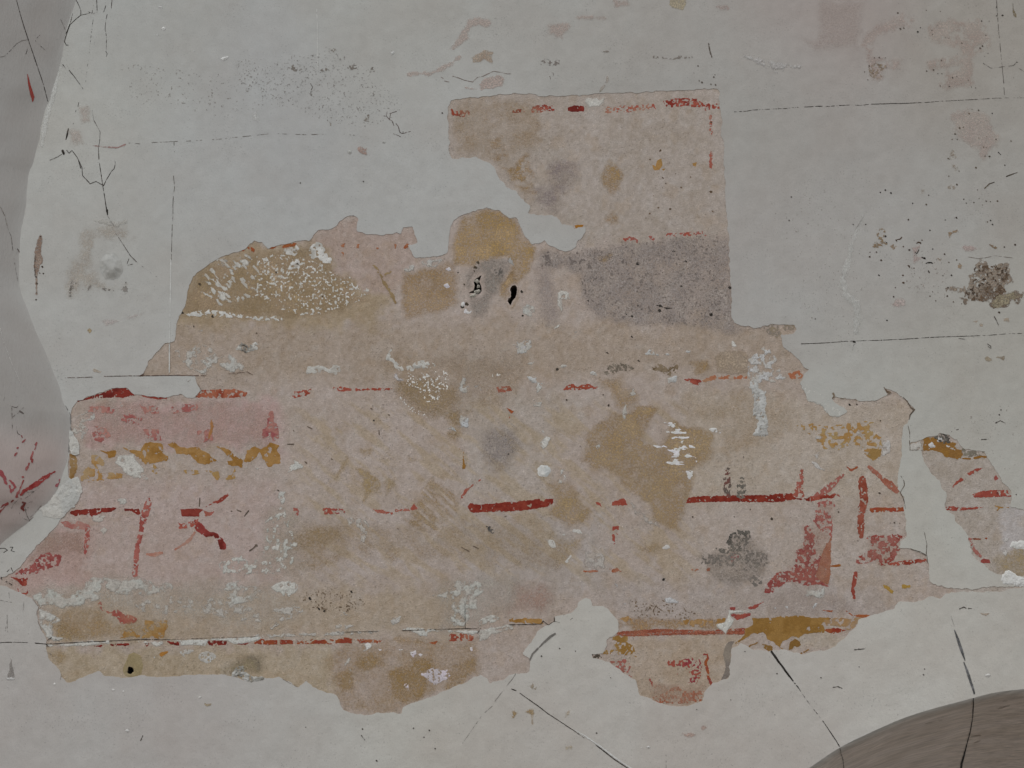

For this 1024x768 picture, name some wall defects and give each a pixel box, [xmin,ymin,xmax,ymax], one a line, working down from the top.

crack [1,0,151,273]
peeling [261,265,282,291]
peeling [910,433,1024,576]
crack [462,617,631,768]
crack [770,651,844,767]
crack [952,620,975,768]